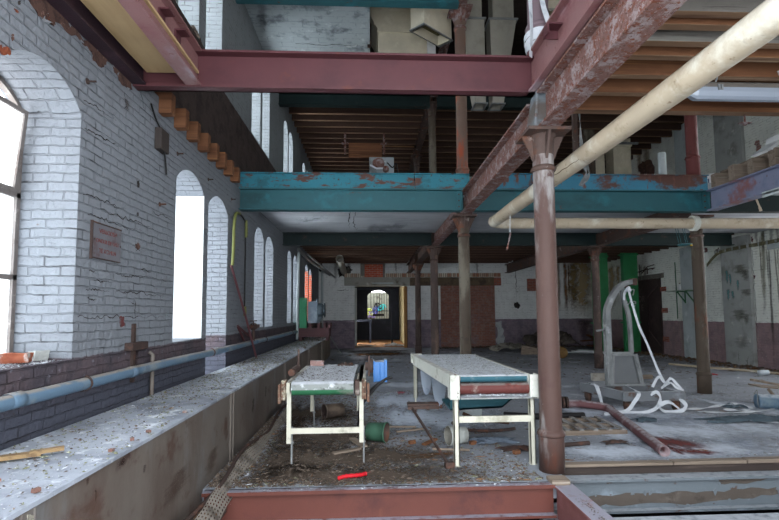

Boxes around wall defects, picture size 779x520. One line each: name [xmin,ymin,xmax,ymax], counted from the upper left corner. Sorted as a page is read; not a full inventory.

spalling [14,0,132,90]
crack [83,194,171,231]
corrosion [557,264,570,305]
water stain [759,234,779,328]
peeling [589,478,779,507]